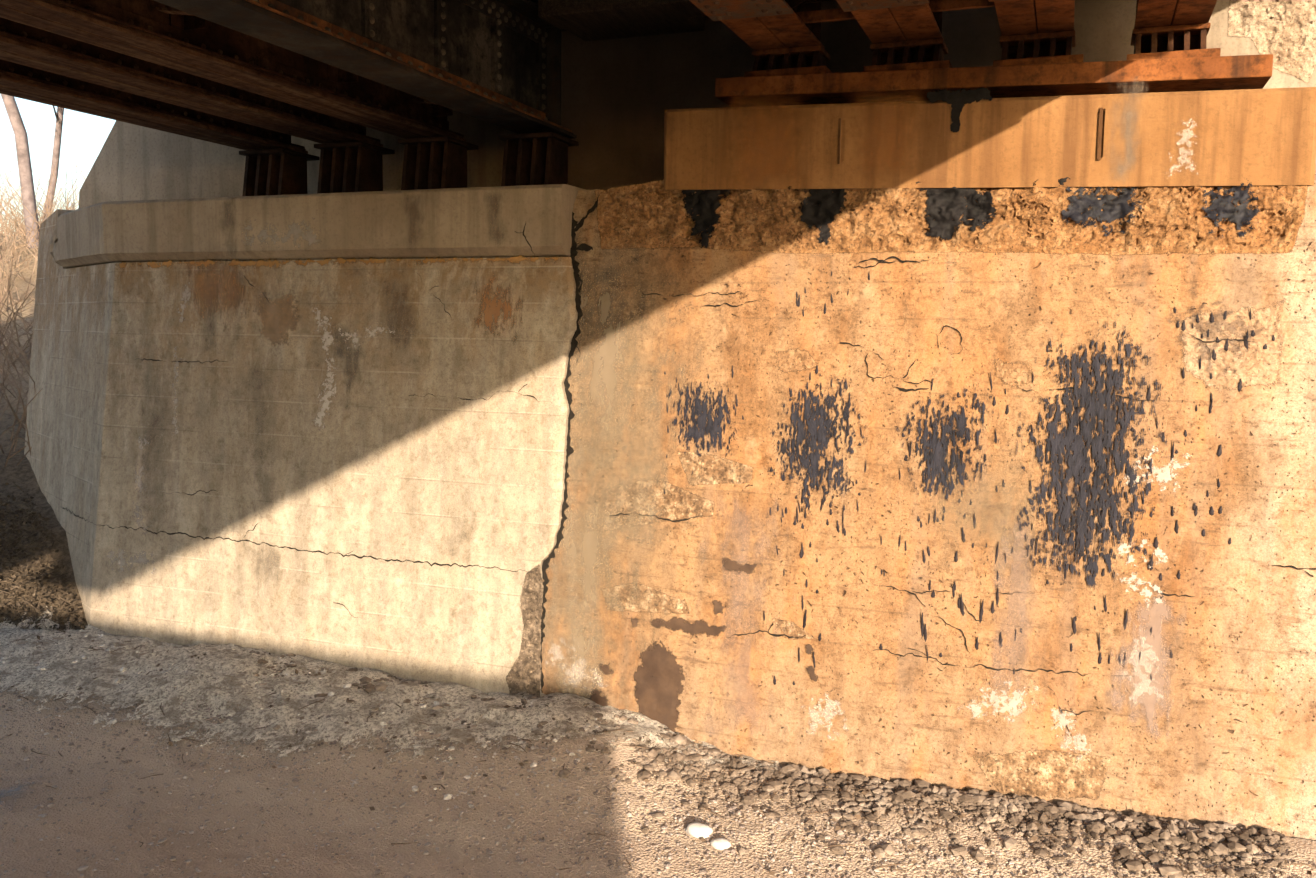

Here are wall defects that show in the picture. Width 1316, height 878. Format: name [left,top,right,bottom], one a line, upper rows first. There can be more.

water stain [699,227,713,248]
water stain [815,215,831,245]
spalling [595,179,1308,255]
water stain [960,188,997,232]
crack [63,195,600,693]
water stain [547,256,662,706]
efflorescence [1126,448,1191,492]
spalling [506,564,544,698]
water stain [631,600,727,733]
water stain [805,644,818,682]